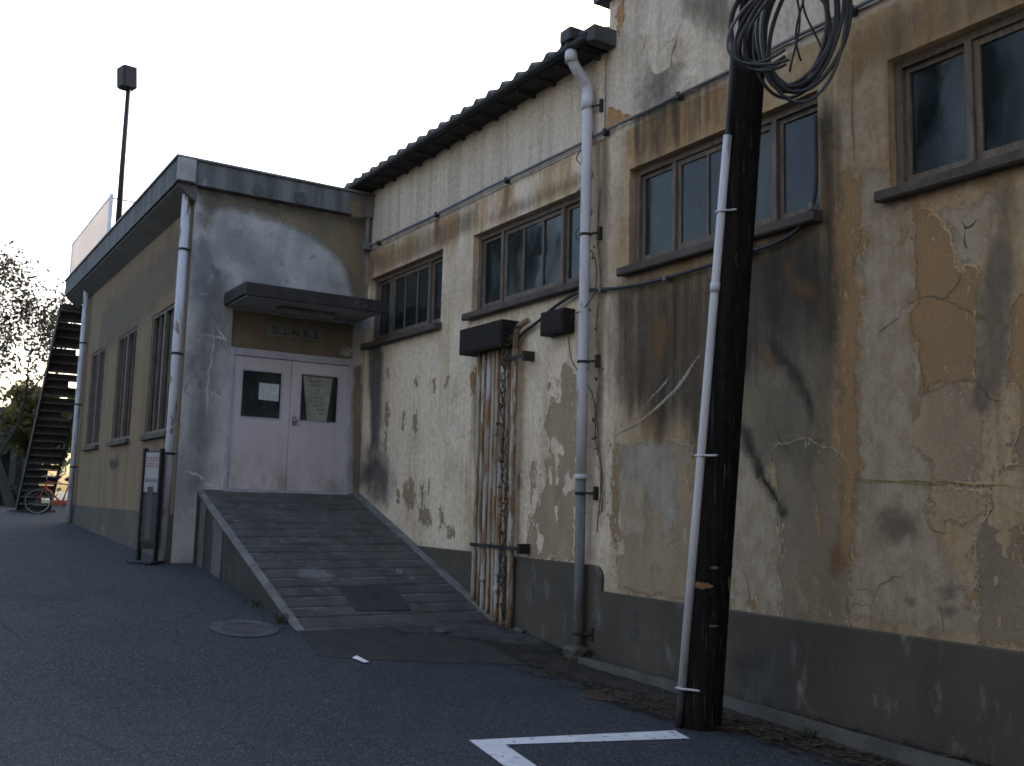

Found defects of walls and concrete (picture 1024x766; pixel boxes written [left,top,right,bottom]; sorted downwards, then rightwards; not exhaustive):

flaking render [614,0,625,37]
flaking render [606,107,633,129]
crack [197,293,227,415]
water stain [743,111,835,463]
peeling [892,196,988,398]
peeling [998,291,1024,400]
water stain [353,346,388,501]
peeling [383,401,418,451]
peeling [394,473,457,545]
peeling [517,360,577,562]
crack [838,478,1022,489]
peeling [961,417,1024,648]